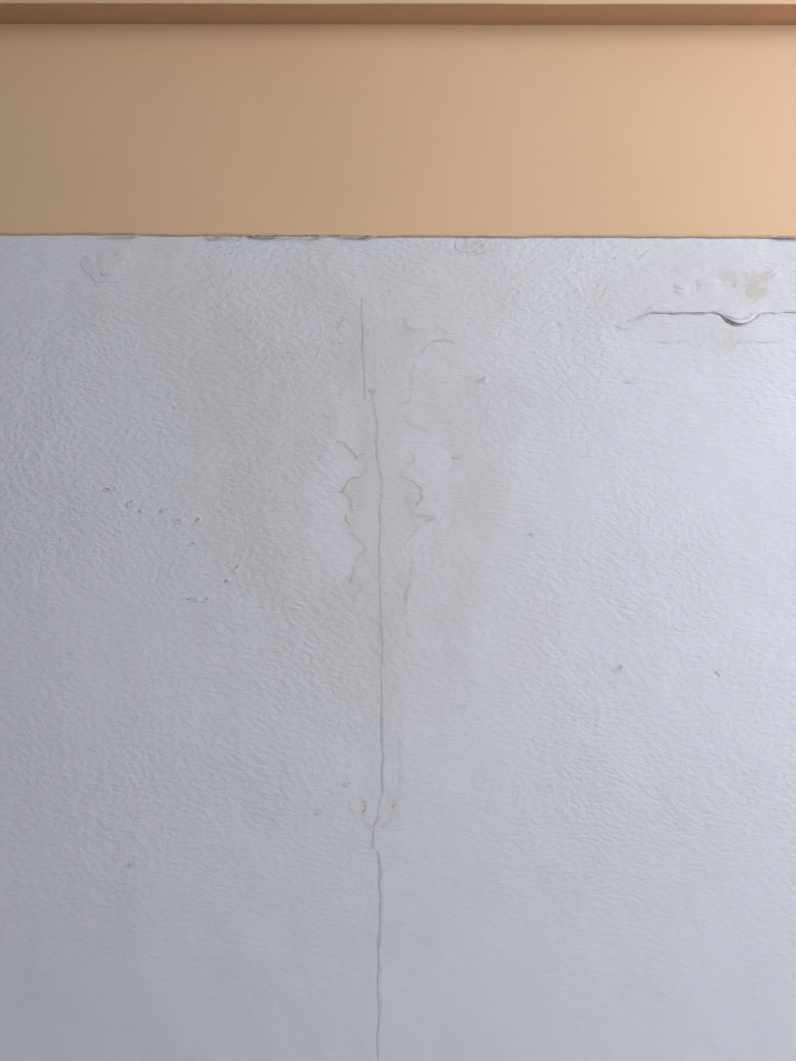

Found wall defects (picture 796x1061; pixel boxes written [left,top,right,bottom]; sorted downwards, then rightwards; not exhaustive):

crack [362,299,386,1061]
leakage [69,239,796,859]
crack [614,304,719,329]